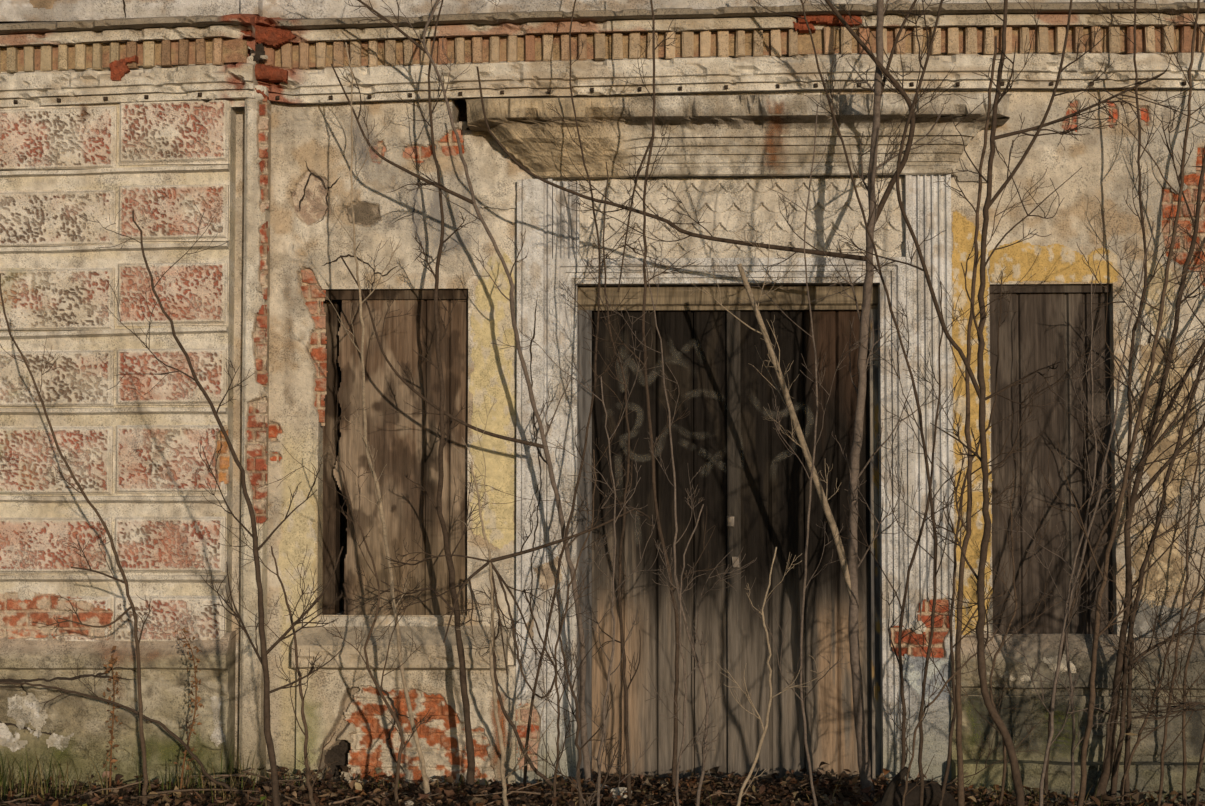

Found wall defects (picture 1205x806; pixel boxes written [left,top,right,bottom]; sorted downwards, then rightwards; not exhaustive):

flaking render [403,121,488,163]
flaking render [216,425,230,484]
flaking render [240,25,297,525]
flaking render [300,260,328,426]
peeling [891,210,1119,702]
flaking render [1121,147,1205,637]
flaking render [0,587,113,640]
peeling [278,481,317,632]
flaking render [339,678,495,783]